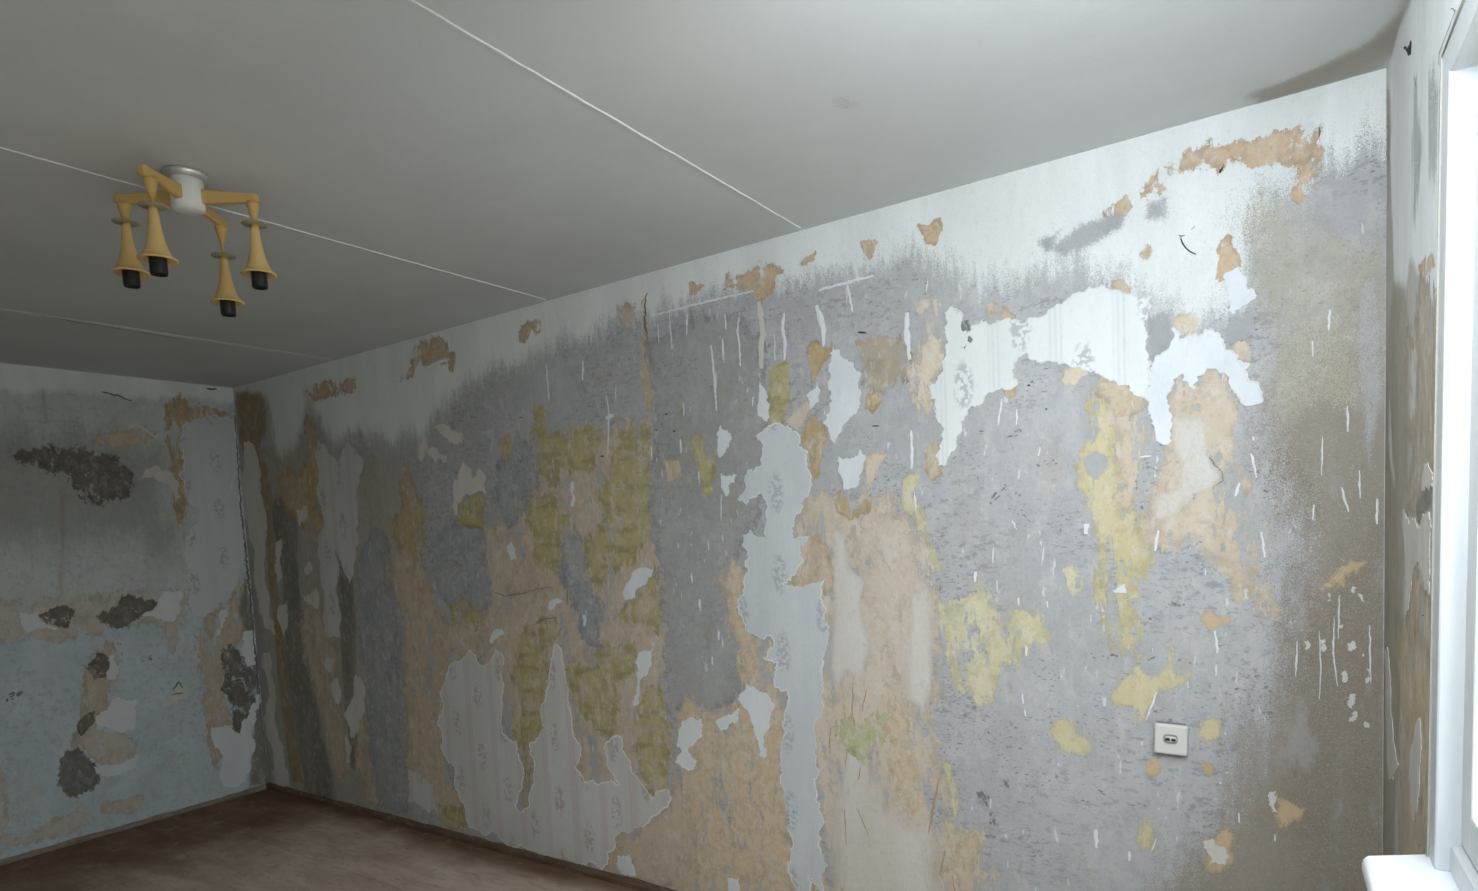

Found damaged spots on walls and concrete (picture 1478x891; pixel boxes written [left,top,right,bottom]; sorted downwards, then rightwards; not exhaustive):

damp [0,374,192,589]
flaking render [0,578,261,815]
flaking render [443,342,700,888]
damp [651,290,787,411]
damp [815,275,874,347]
flaking render [784,451,1010,891]
flaking render [855,292,973,422]
flaking render [1061,367,1292,630]
spalling [1102,116,1332,219]
spalling [1215,234,1242,282]
flaking render [1397,568,1431,855]
flaking render [1403,251,1437,527]